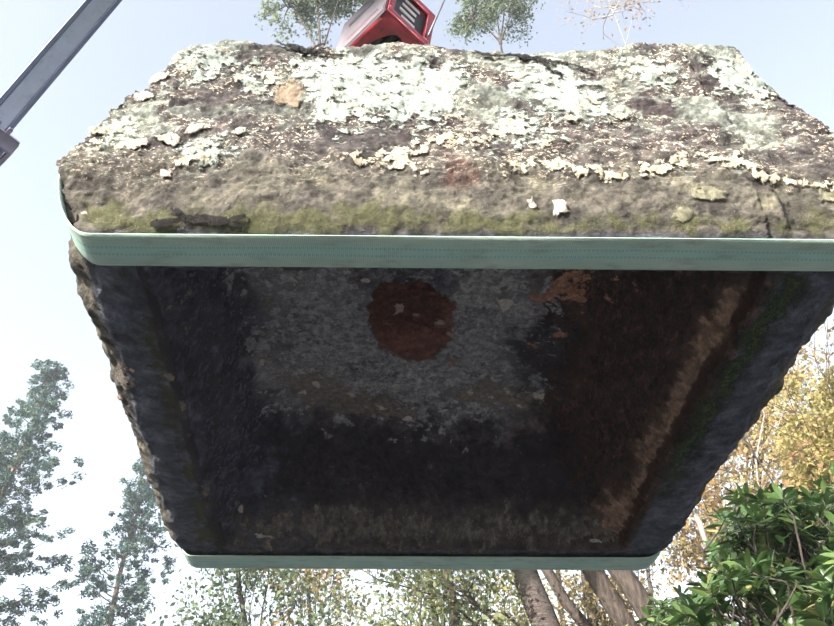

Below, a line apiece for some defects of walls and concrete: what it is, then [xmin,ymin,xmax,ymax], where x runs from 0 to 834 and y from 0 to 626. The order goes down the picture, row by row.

corrosion [366,279,457,362]
damp [167,266,769,556]